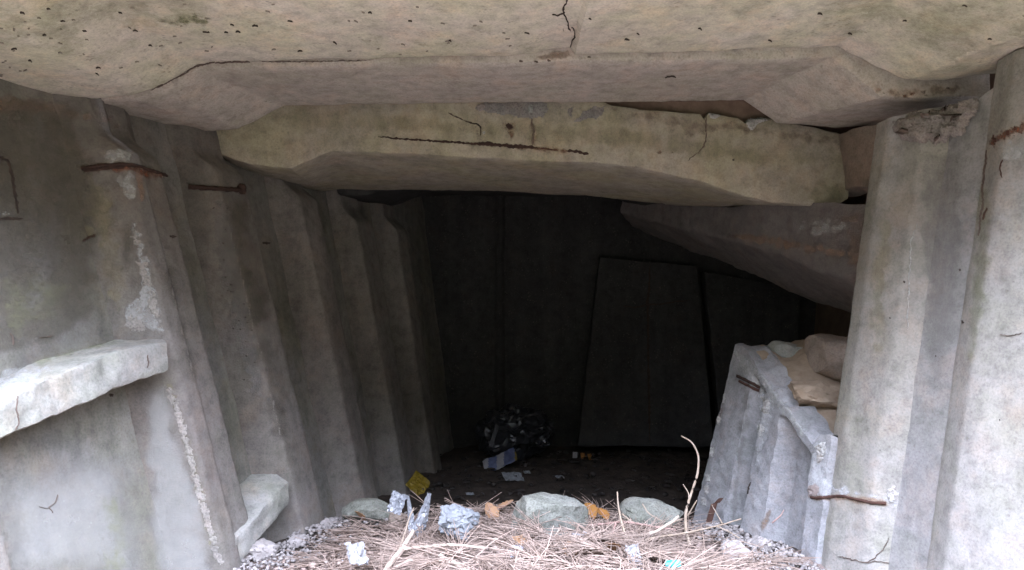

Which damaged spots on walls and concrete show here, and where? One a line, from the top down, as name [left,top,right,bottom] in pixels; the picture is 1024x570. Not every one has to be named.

crack [552,0,576,48]
crack [152,60,369,90]
spalling [892,97,979,146]
corrosion [989,123,1024,145]
corrosion [81,162,168,198]
corrosion [188,183,246,194]
corrosion [736,374,761,392]
corrosion [810,494,886,505]